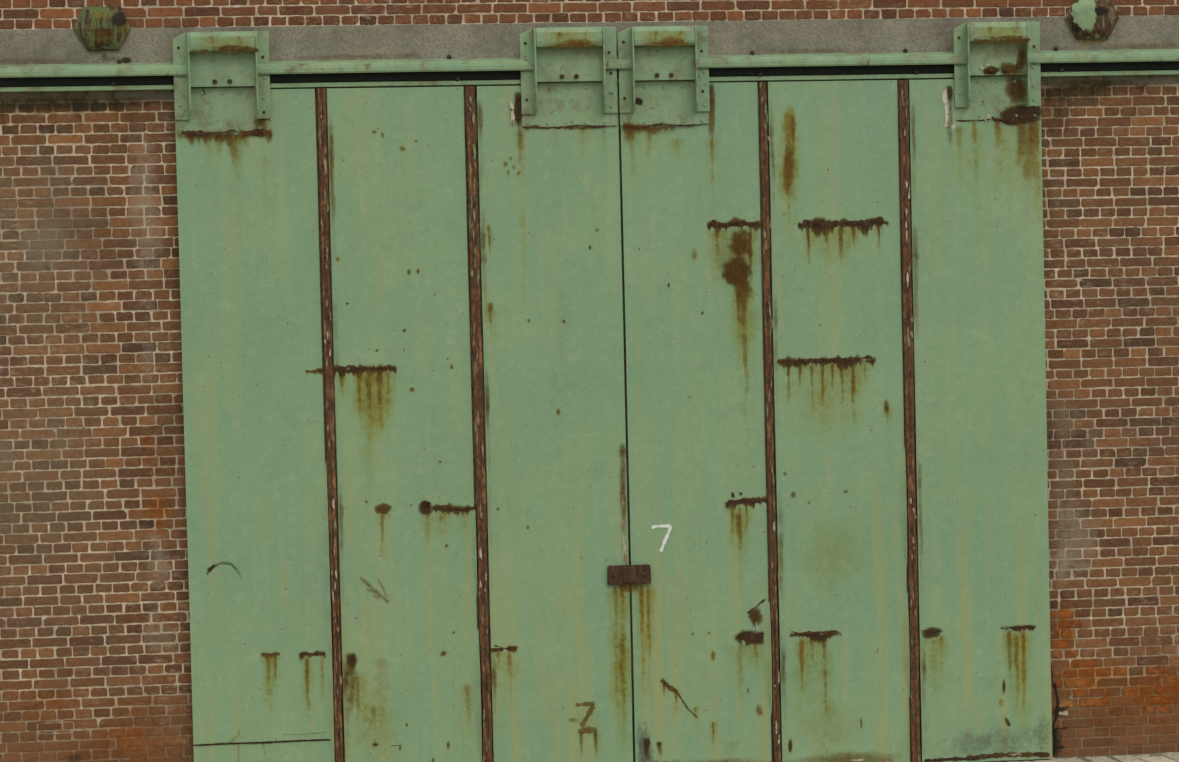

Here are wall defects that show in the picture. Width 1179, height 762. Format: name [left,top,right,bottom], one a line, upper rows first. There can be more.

rust [956,36,1041,133]
peeling [942,87,956,129]
rust [181,120,272,140]
rust [798,216,888,241]
rust [707,219,761,308]
rust [307,365,396,382]
rust [778,355,875,383]
rust [420,501,476,514]
rust [726,491,767,507]
rust [791,630,838,642]